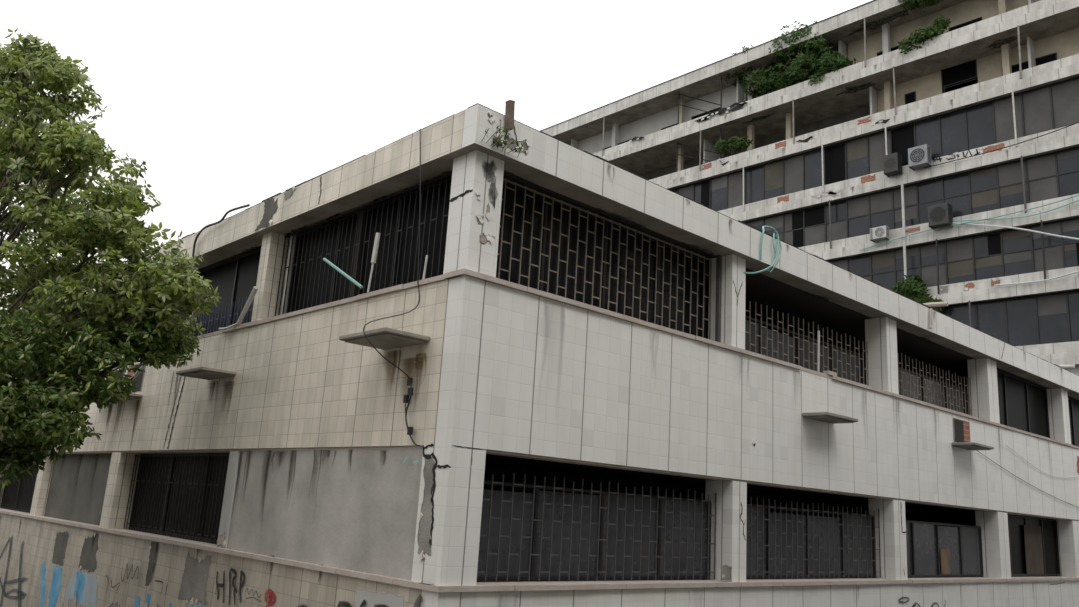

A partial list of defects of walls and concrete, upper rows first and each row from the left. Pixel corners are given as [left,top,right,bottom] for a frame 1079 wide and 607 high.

spalling [493,133,531,155]
peeling [475,190,492,245]